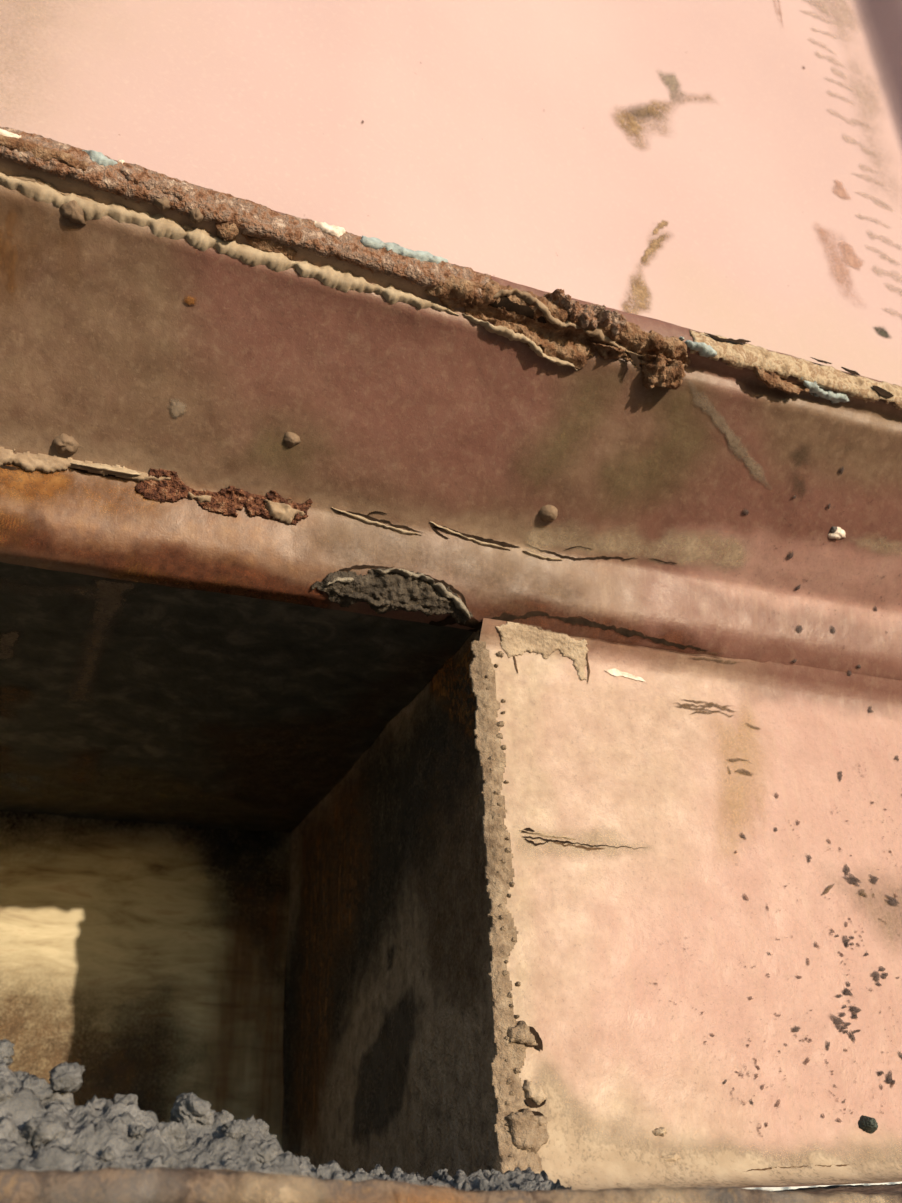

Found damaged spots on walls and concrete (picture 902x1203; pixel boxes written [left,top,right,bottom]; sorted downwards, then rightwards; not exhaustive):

damp [803,0,888,208]
rust [0,127,492,299]
damp [839,216,902,295]
rust [545,289,902,410]
rust [0,464,70,501]
rust [0,512,327,609]
rust [135,468,313,525]
crack [333,508,677,564]
peeling [496,621,590,683]
crack [429,611,708,651]
crack [519,828,644,851]
damp [353,993,416,1141]